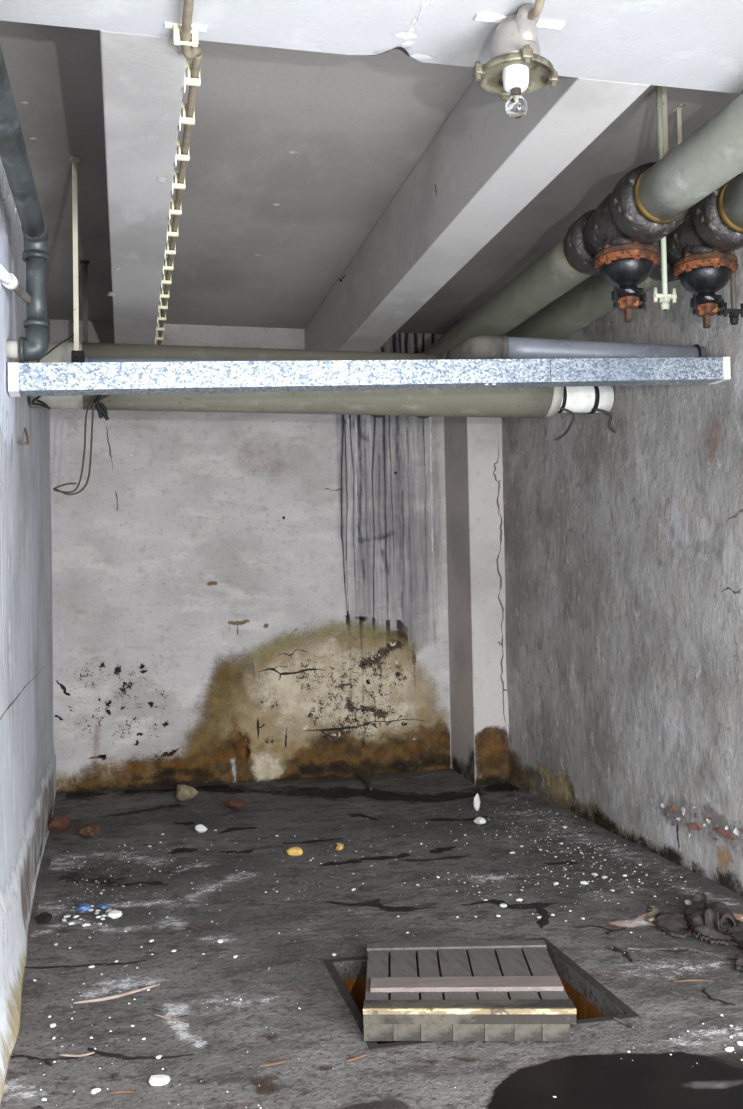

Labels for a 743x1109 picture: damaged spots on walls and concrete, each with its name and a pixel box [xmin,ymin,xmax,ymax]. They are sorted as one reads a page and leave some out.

leakage [381,332,434,353]
crack [493,427,507,726]
crack [252,628,323,681]
crack [0,670,71,720]
crack [257,715,423,747]
leakage [0,415,743,1102]
flaking render [660,802,743,841]
crack [327,899,736,962]
crack [9,1047,193,1066]
leakage [343,1100,409,1109]